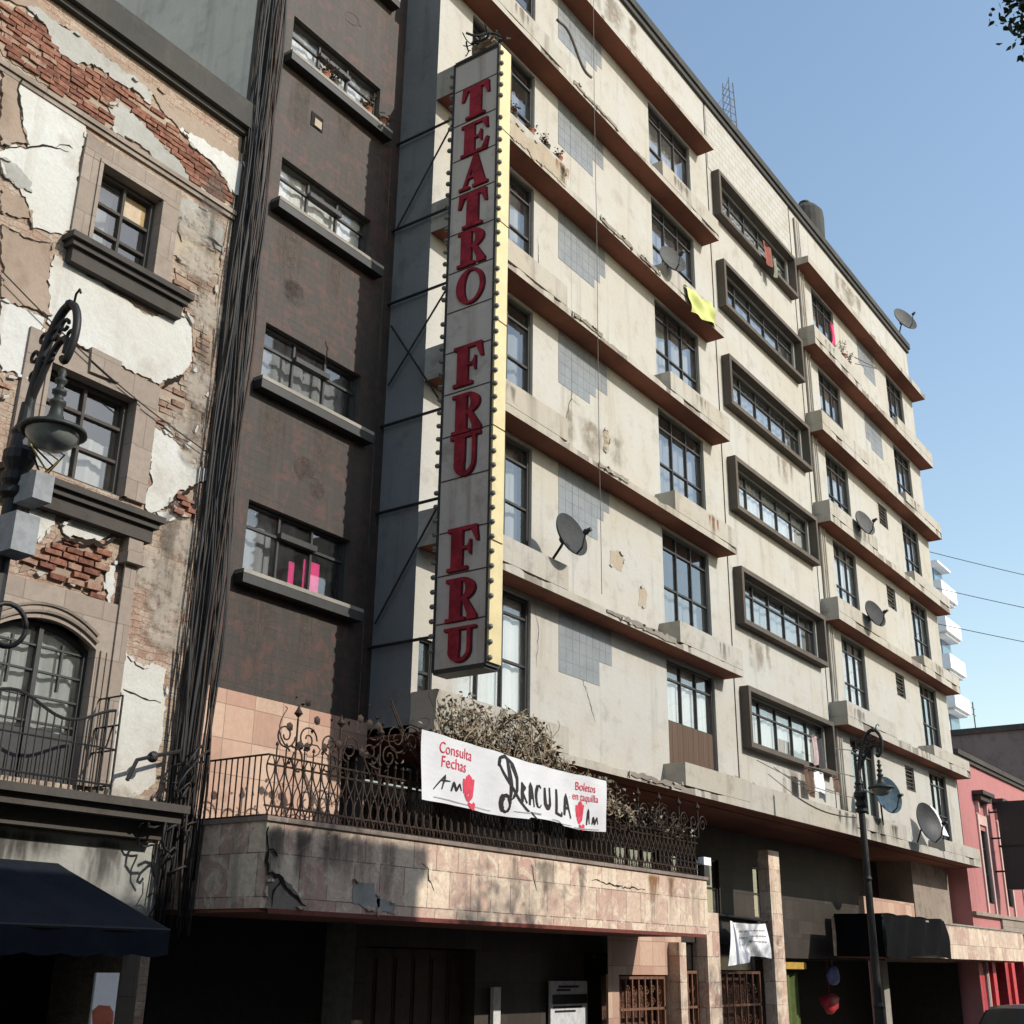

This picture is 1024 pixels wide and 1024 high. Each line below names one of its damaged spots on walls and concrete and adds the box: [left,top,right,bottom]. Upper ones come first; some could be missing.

crack [1,79,72,152]
flaking render [0,0,250,522]
flaking render [19,509,118,602]
peeling [610,550,625,572]
crack [264,826,306,907]
peeling [352,879,396,917]
crack [592,879,645,890]